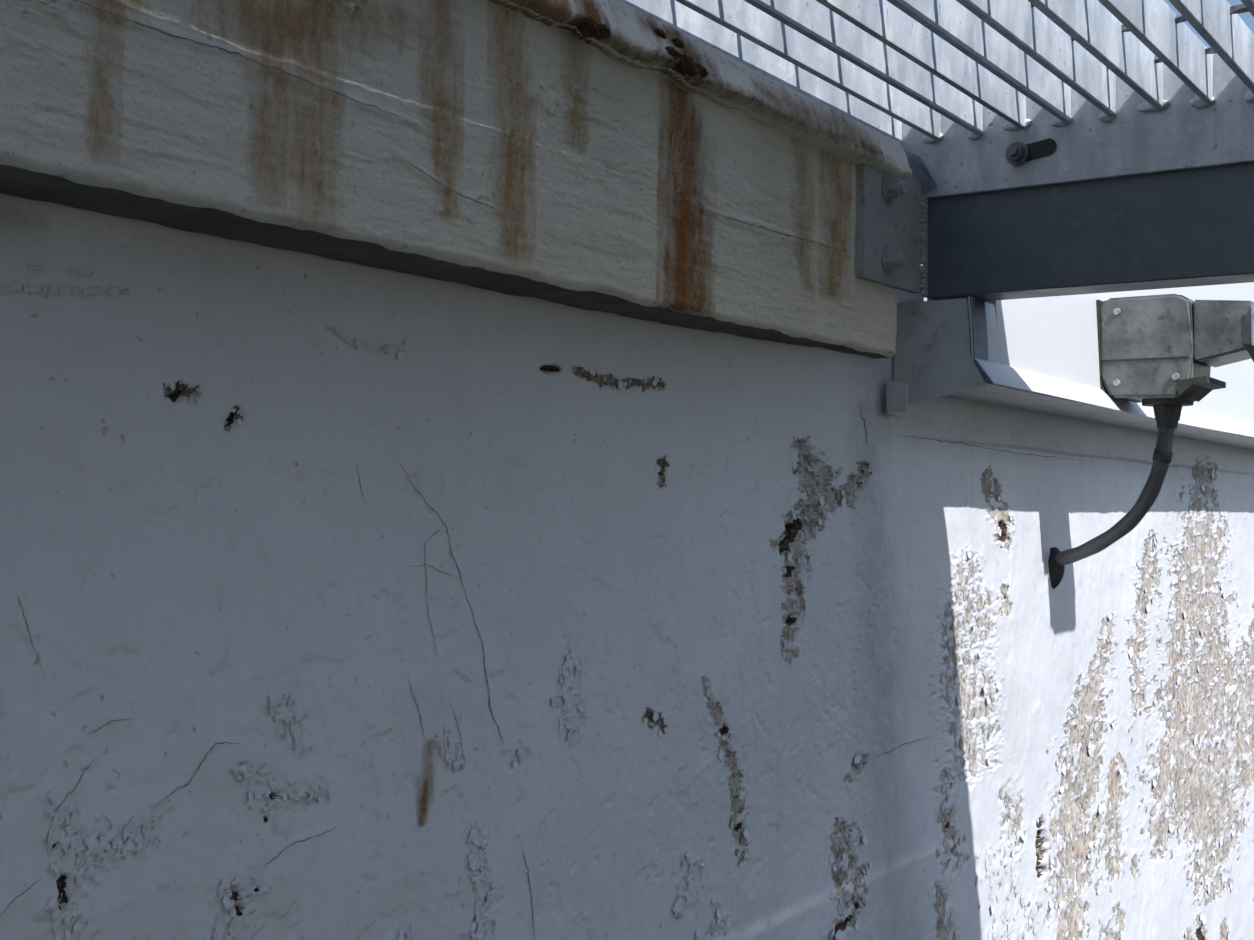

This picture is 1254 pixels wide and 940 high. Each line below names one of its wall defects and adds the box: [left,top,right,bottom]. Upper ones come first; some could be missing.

rust [500,0,876,314]
spalling [163,381,203,405]
peeling [539,365,666,391]
crack [400,464,505,746]
flaking render [769,434,873,665]
flaking render [981,465,1015,550]
peeling [999,581,1013,616]
peeling [1119,455,1254,940]
rust [419,779,430,825]
peeling [699,677,750,868]
flaking render [826,817,873,940]
peeling [999,781,1054,878]